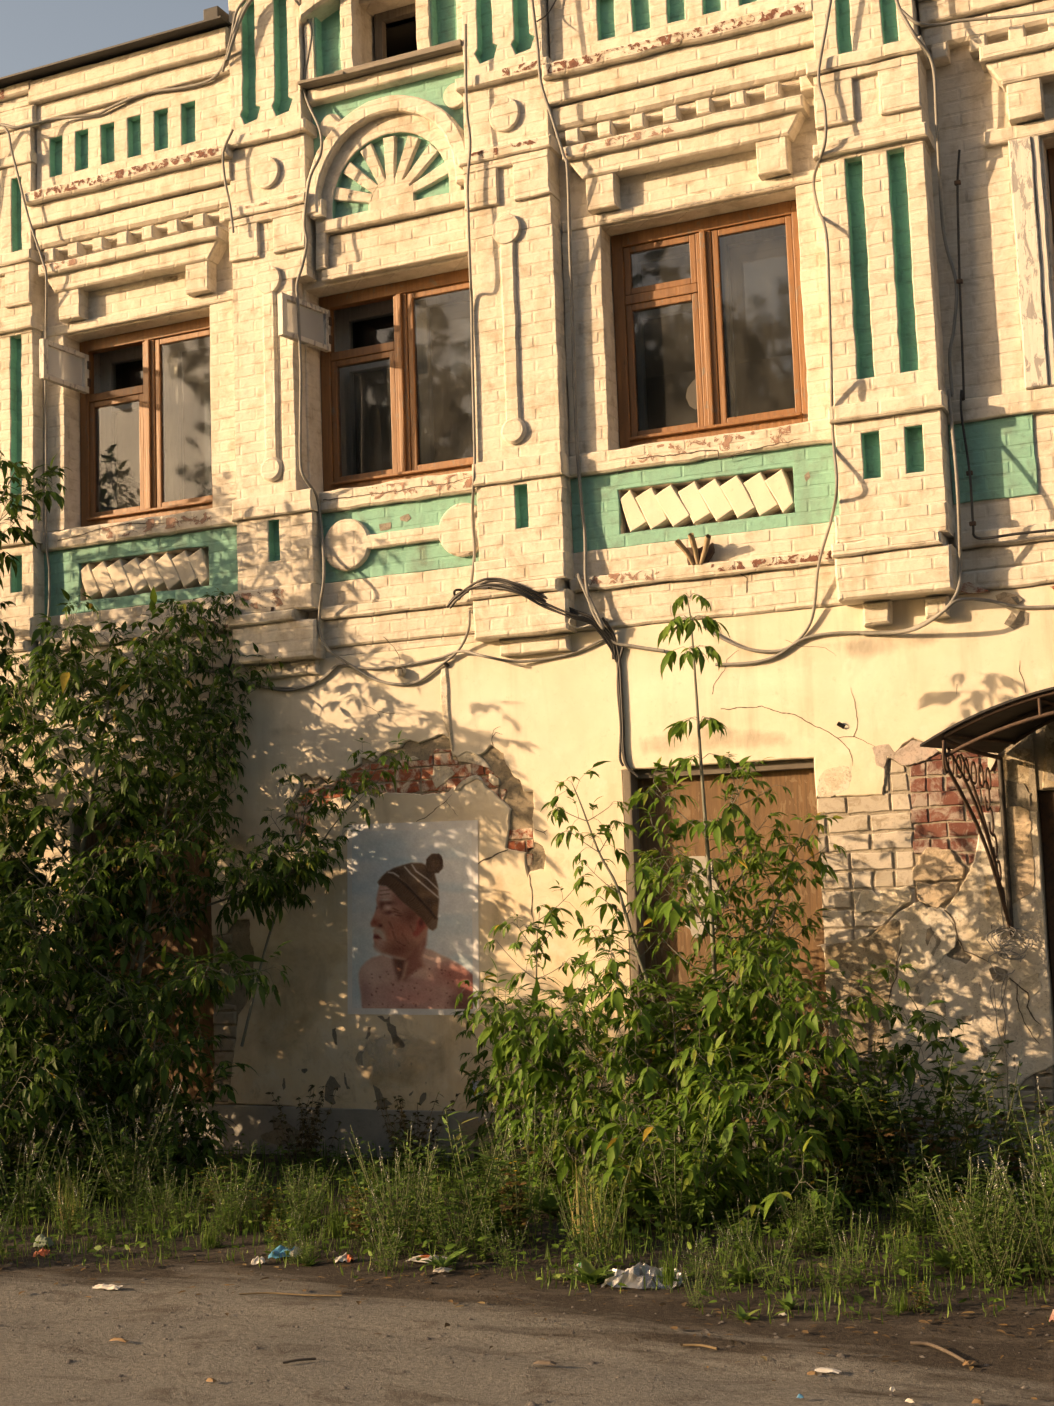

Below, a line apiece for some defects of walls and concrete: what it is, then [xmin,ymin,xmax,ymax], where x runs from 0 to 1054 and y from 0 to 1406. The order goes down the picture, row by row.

peeling [502,2,804,76]
crack [712,650,875,766]
flaking render [287,735,546,873]
flaking render [817,733,1054,1087]
flaking render [324,1016,412,1115]
flaking render [982,1043,1054,1121]